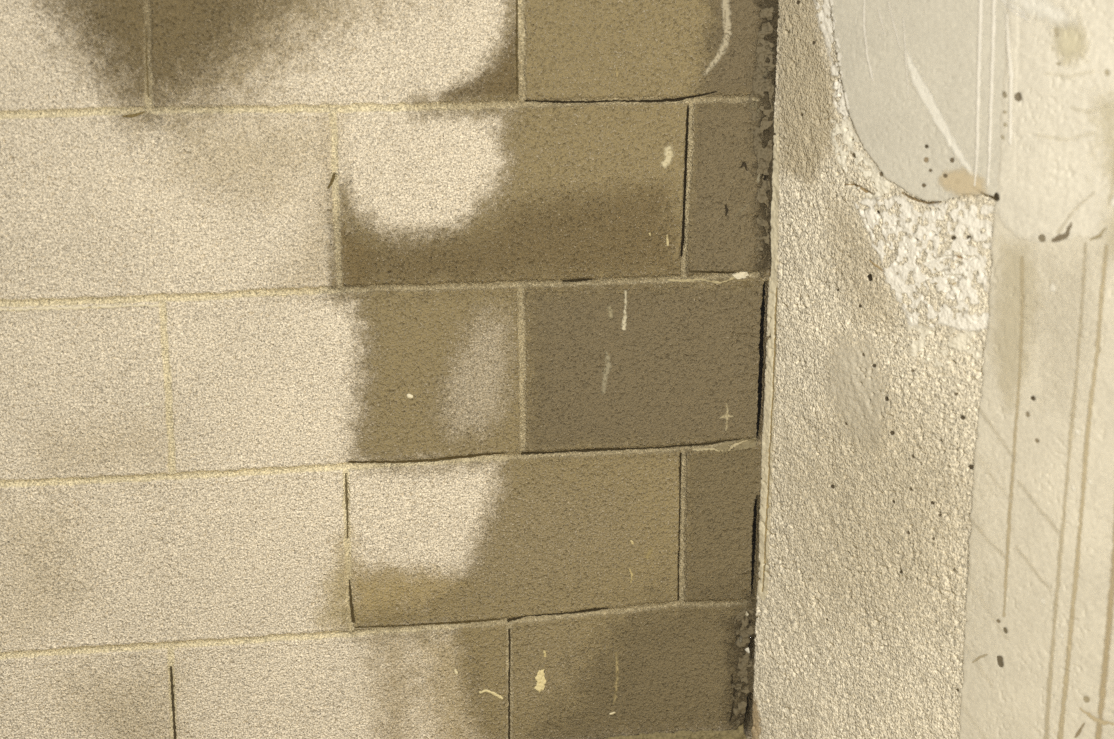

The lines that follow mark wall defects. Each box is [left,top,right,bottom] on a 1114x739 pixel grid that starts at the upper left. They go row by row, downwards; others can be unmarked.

crack [515,0,734,274]
peeling [812,0,1000,372]
crack [349,580,608,739]